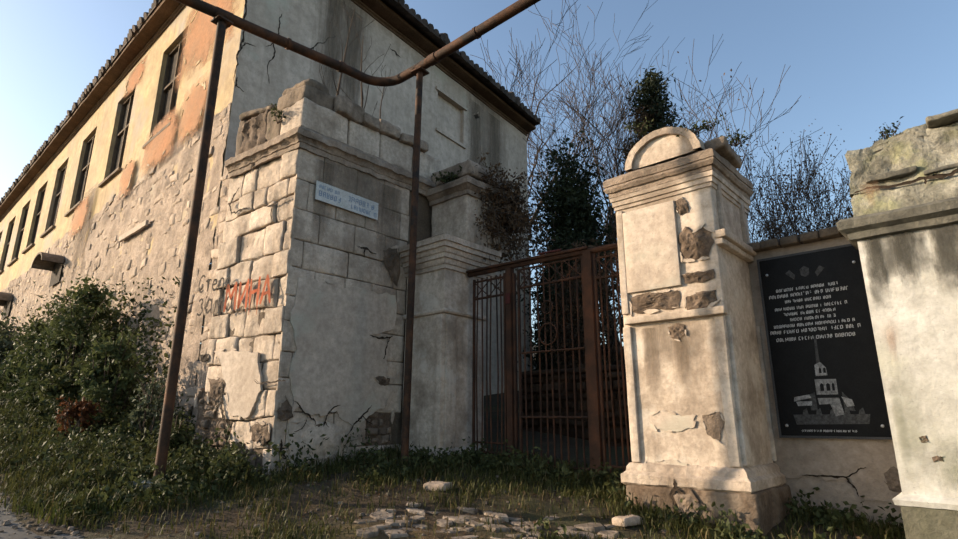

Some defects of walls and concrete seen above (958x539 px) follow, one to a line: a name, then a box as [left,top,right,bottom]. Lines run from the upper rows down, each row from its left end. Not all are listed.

flaking render [177,0,234,83]
crack [234,0,282,92]
flaking render [119,79,209,198]
flaking render [71,198,88,237]
spalling [629,223,720,317]
spalling [674,196,689,215]
crack [853,168,958,194]
damp [866,223,958,295]
flaking render [193,245,400,472]
crack [252,359,372,469]
peeling [649,410,725,444]
crack [802,467,866,496]